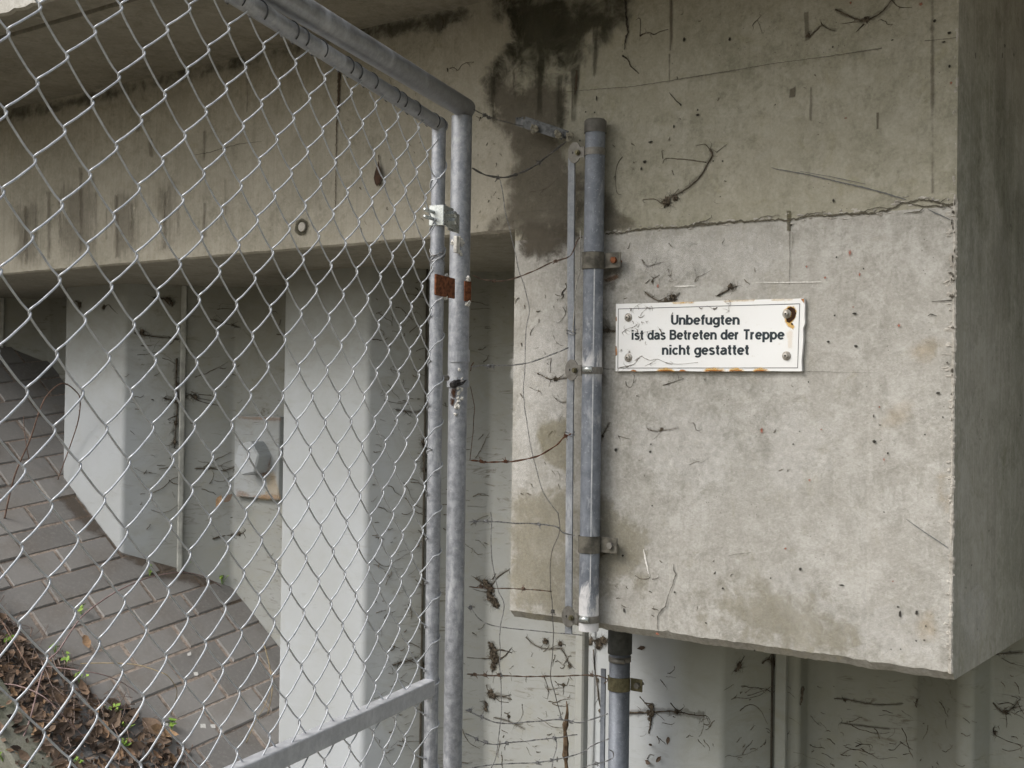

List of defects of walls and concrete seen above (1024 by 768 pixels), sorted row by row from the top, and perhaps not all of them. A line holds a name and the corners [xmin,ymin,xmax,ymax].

leakage [488,0,627,255]
crack [605,168,953,282]